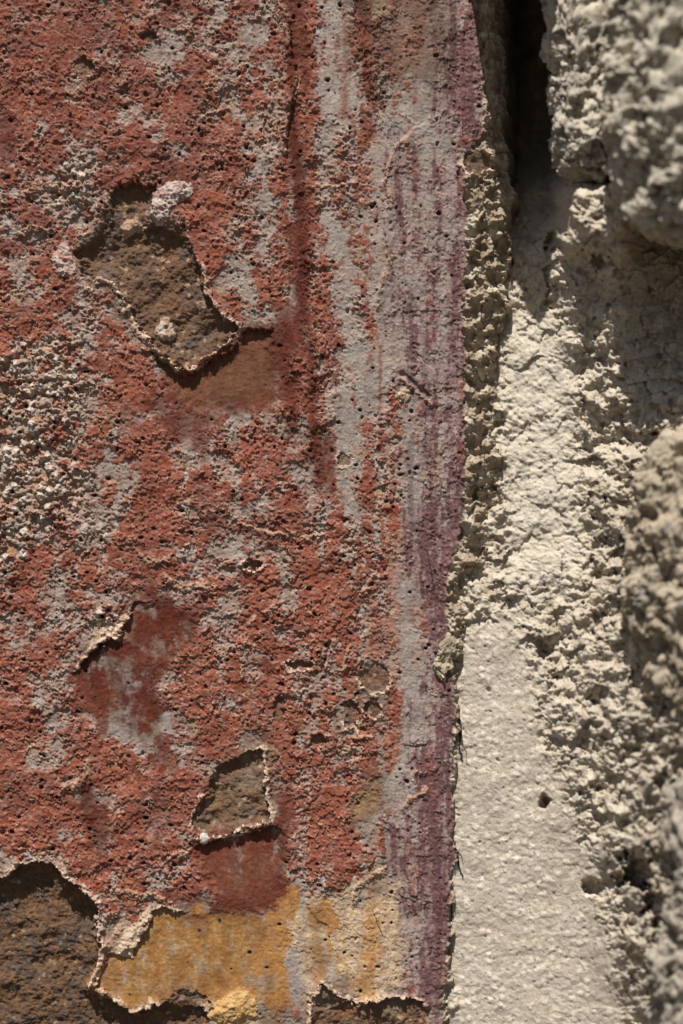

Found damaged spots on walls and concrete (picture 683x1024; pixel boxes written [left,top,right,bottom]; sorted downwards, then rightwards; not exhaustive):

spalling [74,184,271,408]
peeling [71,553,217,740]
spalling [163,744,285,899]
spalling [0,854,262,1024]